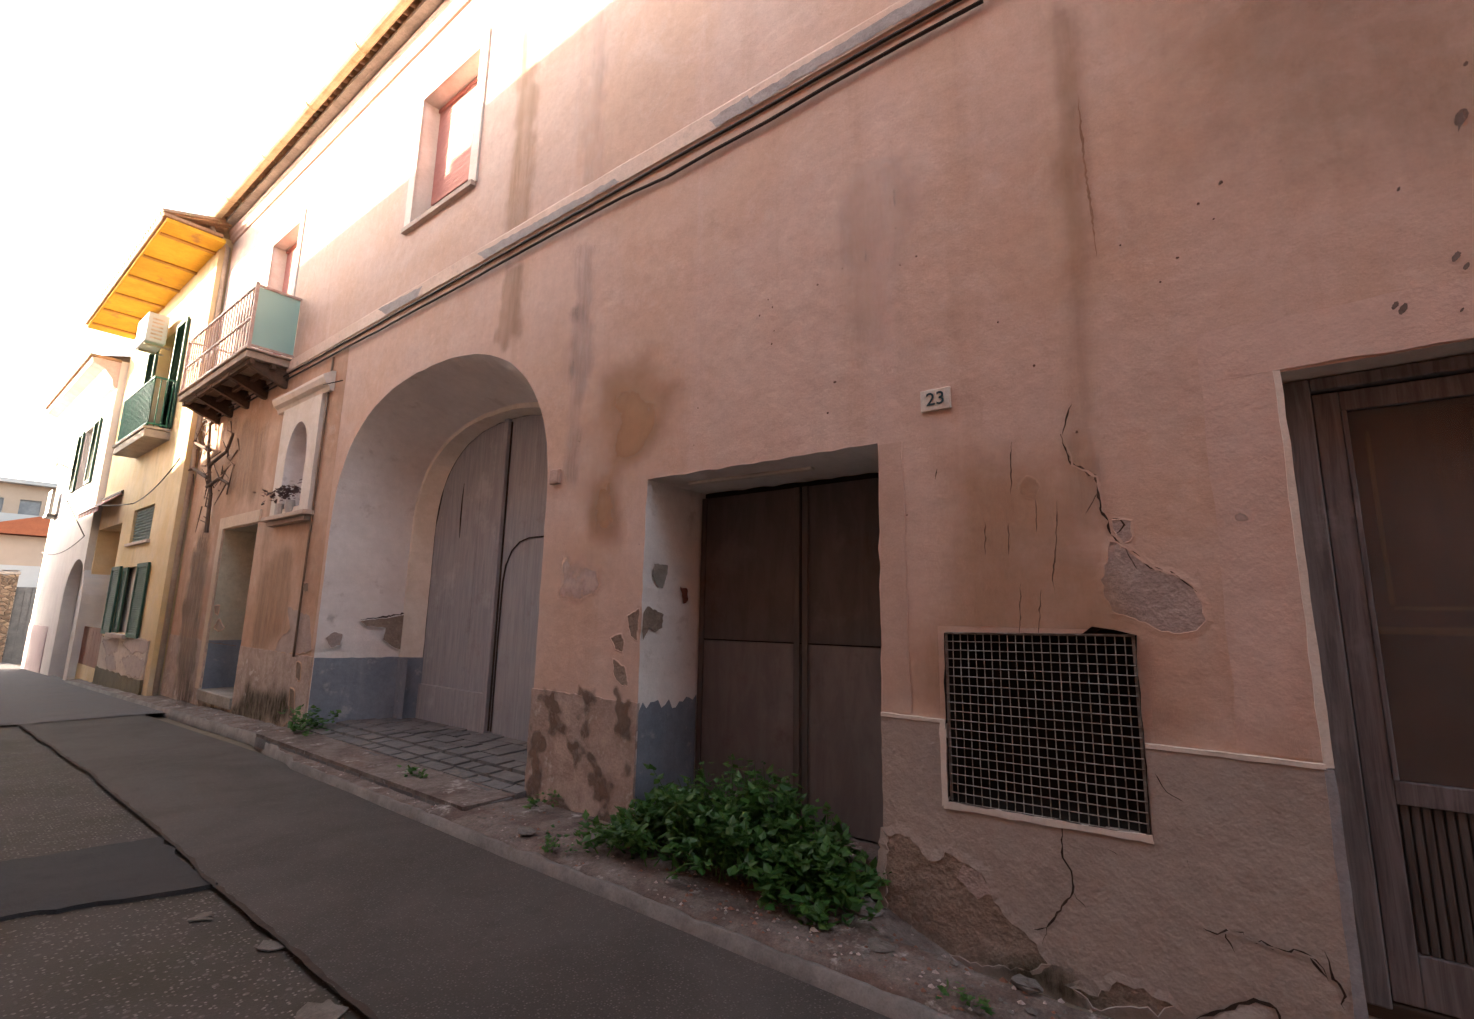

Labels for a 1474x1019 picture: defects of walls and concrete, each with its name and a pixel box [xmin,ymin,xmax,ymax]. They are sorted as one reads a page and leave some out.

peeling [275,582,344,727]
spalling [359,614,404,650]
peeling [610,606,664,740]
spalling [652,564,688,604]
crack [984,404,1197,633]
spalling [1094,518,1215,640]
peeling [526,686,630,823]
peeling [876,824,1184,1019]
crack [1034,828,1085,940]
crack [1204,928,1350,1012]